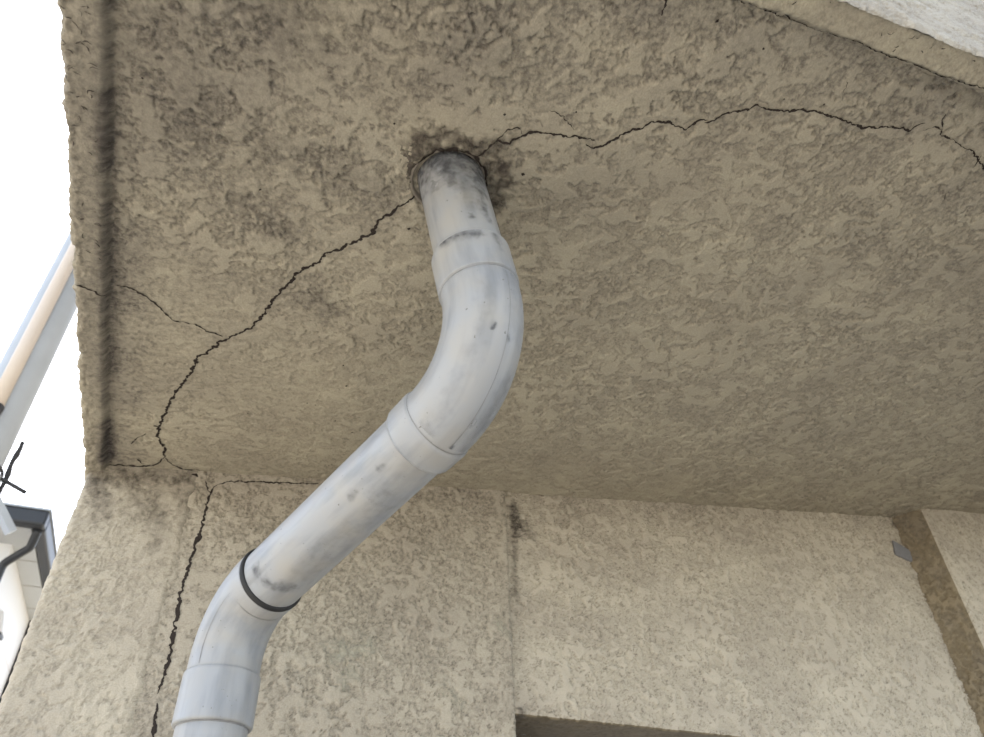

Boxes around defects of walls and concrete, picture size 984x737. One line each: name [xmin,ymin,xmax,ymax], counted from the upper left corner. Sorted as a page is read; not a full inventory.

crack [60,6,98,155]
crack [741,1,984,89]
damp [400,130,512,206]
crack [477,104,984,170]
damp [101,419,115,462]
crack [77,196,415,737]